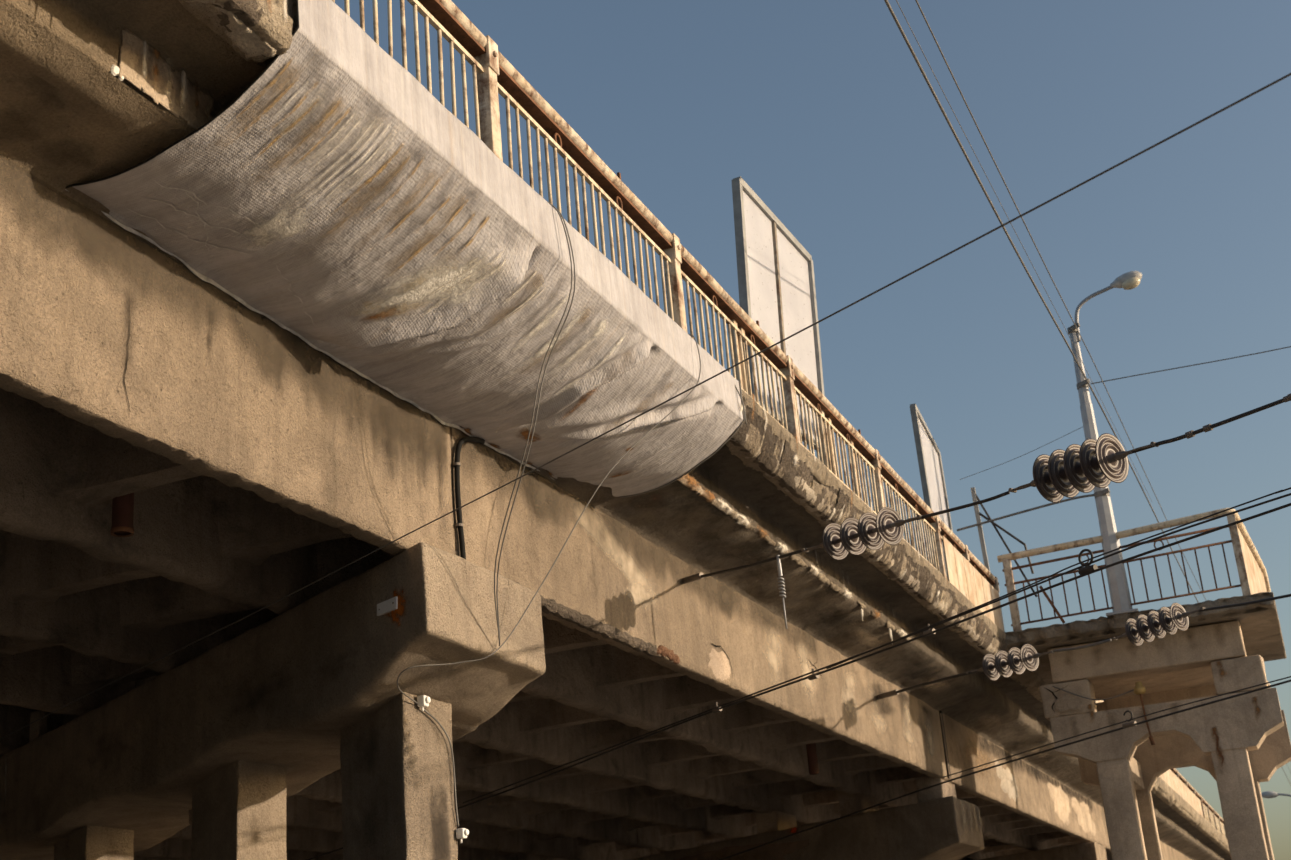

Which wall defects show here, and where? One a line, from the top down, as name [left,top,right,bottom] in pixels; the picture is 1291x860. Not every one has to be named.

spalling [180,0,293,62]
corrosion [237,60,349,167]
leakage [127,113,391,324]
corrosion [336,146,489,268]
crack [117,309,136,415]
leakage [0,158,446,481]
leakage [365,253,506,319]
spalling [725,394,872,527]
spalling [540,595,680,664]
leakage [463,433,816,689]
peeling [708,643,733,681]
spalling [710,498,913,643]